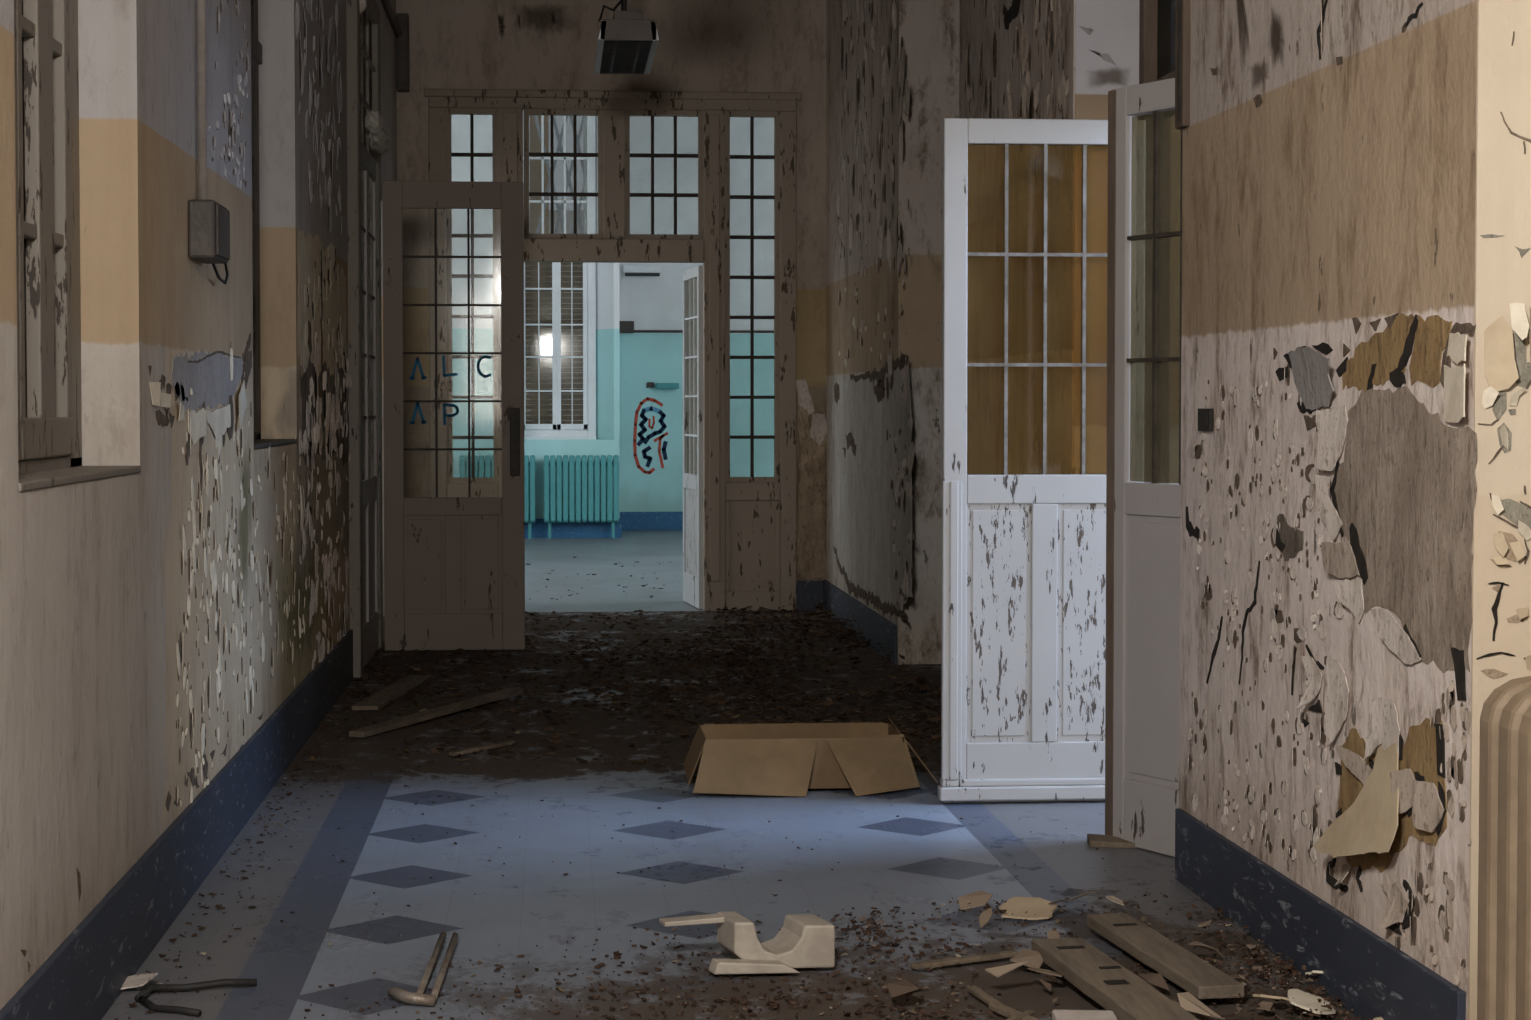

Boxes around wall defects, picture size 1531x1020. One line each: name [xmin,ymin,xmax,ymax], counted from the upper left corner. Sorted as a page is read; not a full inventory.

peeling [965,0,1116,119]
crack [1317,0,1328,60]
crack [1405,2,1423,26]
crack [1500,112,1531,154]
peeling [1480,234,1530,258]
flaking render [834,0,915,621]
peeling [148,0,352,812]
flaking render [1187,302,1531,965]